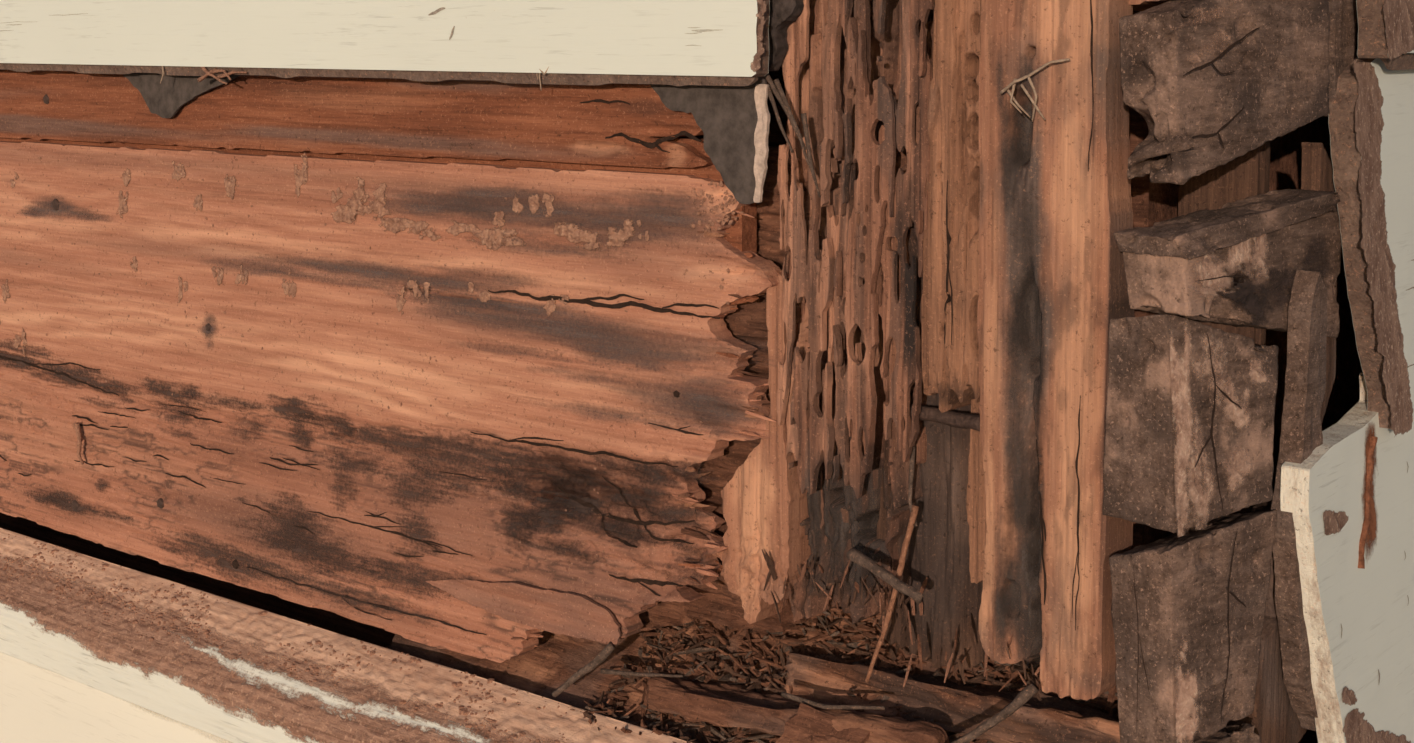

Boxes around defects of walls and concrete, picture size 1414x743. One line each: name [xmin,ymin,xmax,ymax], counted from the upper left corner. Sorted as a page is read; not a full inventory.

peeling [750,0,766,72]
peeling [1354,59,1413,436]
leakage [250,259,689,369]
crack [488,290,720,319]
leakage [666,379,749,424]
peeling [1224,360,1267,428]
crack [0,356,472,558]
leakage [0,341,705,620]
crack [438,471,487,480]
peeling [1323,510,1348,535]
peeling [0,528,687,743]
peeling [1342,686,1411,743]